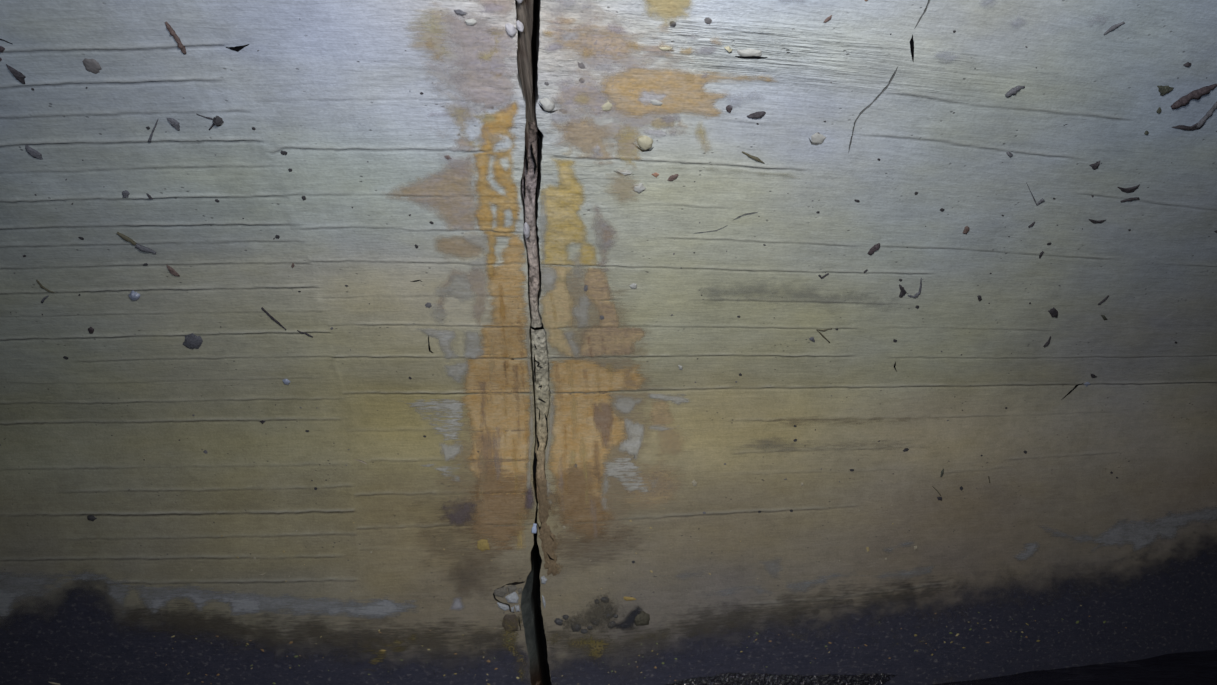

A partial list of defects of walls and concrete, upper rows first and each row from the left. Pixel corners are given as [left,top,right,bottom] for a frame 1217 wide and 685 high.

rust [546,20,770,160]
rust [648,0,689,19]
rust [394,103,531,549]
crack [511,0,552,685]
rust [542,160,645,539]
damp [0,572,531,685]
damp [550,509,1217,685]